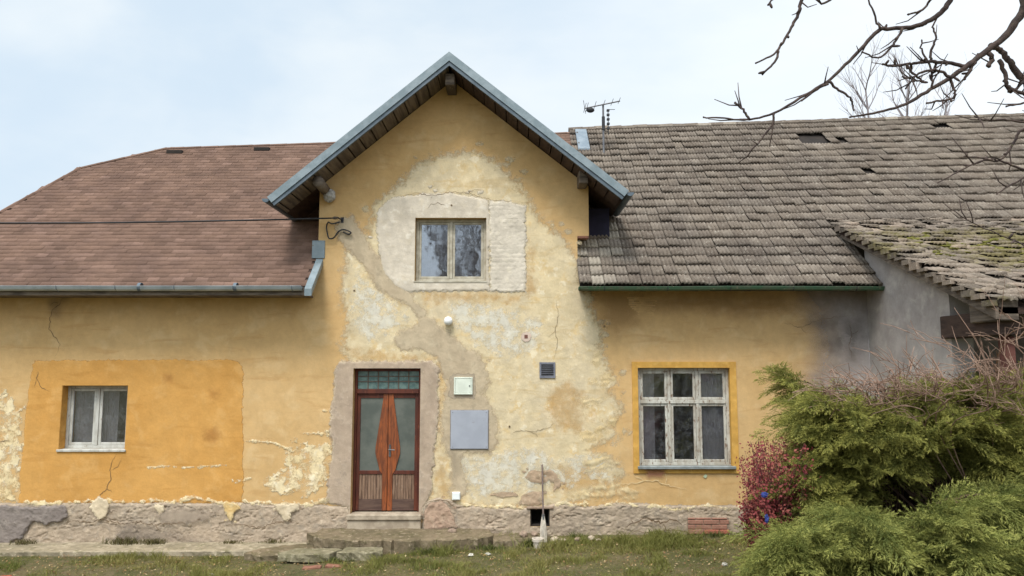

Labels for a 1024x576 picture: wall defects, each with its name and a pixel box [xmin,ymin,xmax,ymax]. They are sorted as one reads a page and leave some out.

peeling [336,143,743,534]
peeling [0,389,94,506]
crack [66,457,185,530]
peeling [107,430,333,514]